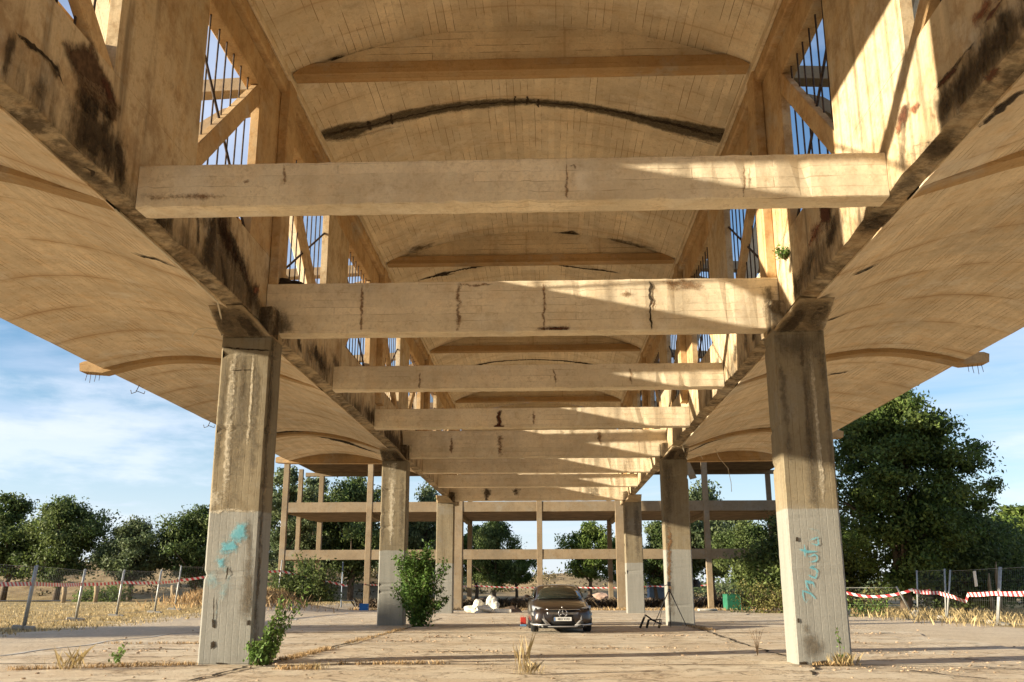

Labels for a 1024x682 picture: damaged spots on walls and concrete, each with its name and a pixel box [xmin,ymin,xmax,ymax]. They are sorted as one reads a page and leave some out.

water stain [915,0,1024,163]
water stain [54,104,126,195]
crack [321,96,725,145]
rust [896,103,918,167]
water stain [857,214,890,232]
crack [357,288,365,329]
crack [418,266,489,330]
crack [538,265,616,330]
crack [647,281,655,329]
crack [494,411,504,453]